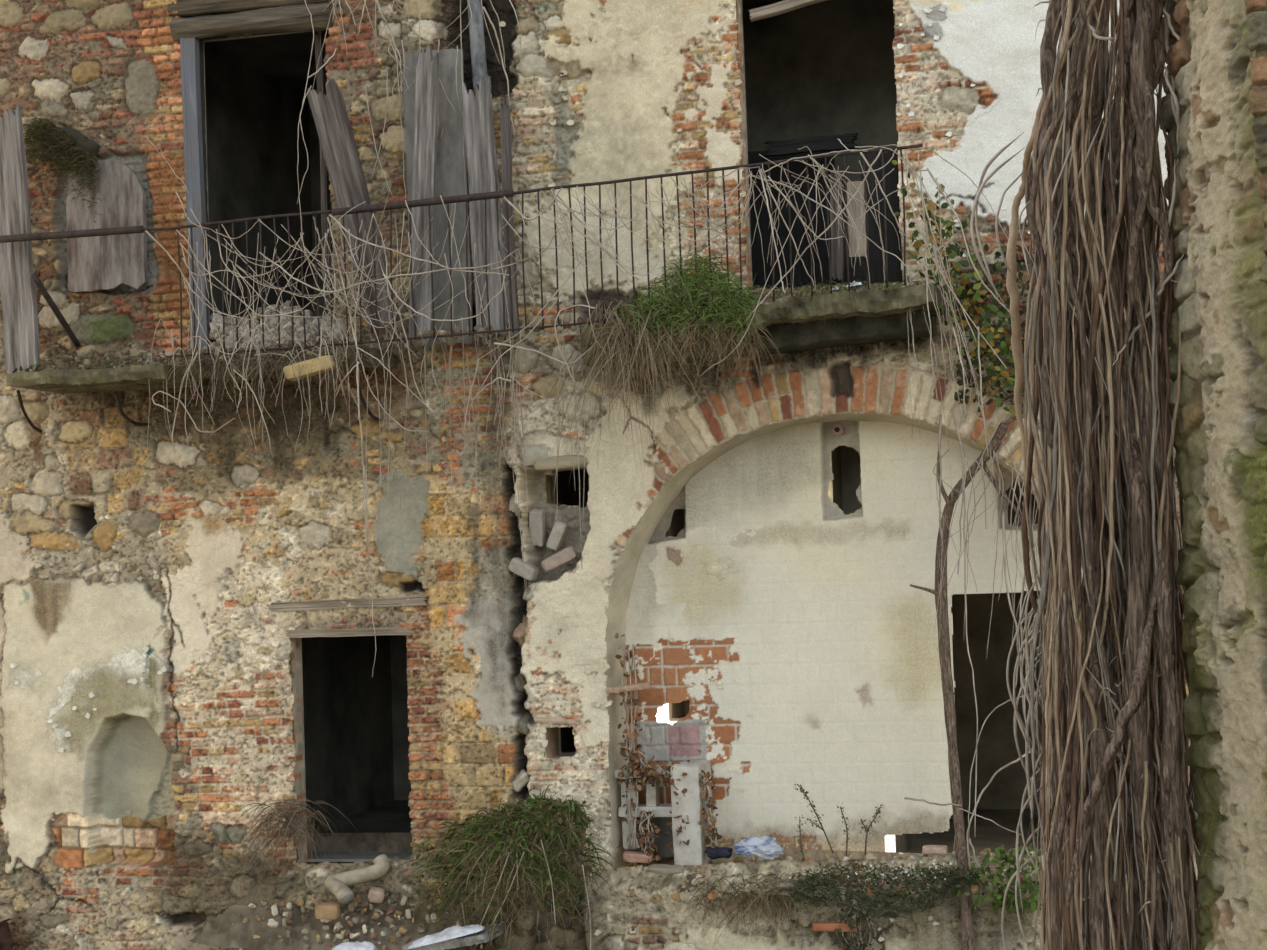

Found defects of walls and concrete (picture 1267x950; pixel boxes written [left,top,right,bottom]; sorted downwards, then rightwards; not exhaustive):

spalling [500,5,580,187]
spalling [672,37,747,265]
spalling [892,4,1001,142]
water stain [24,581,67,635]
peeling [46,646,167,753]
crack [507,464,535,800]
peeling [635,636,753,800]
spalling [51,809,176,870]